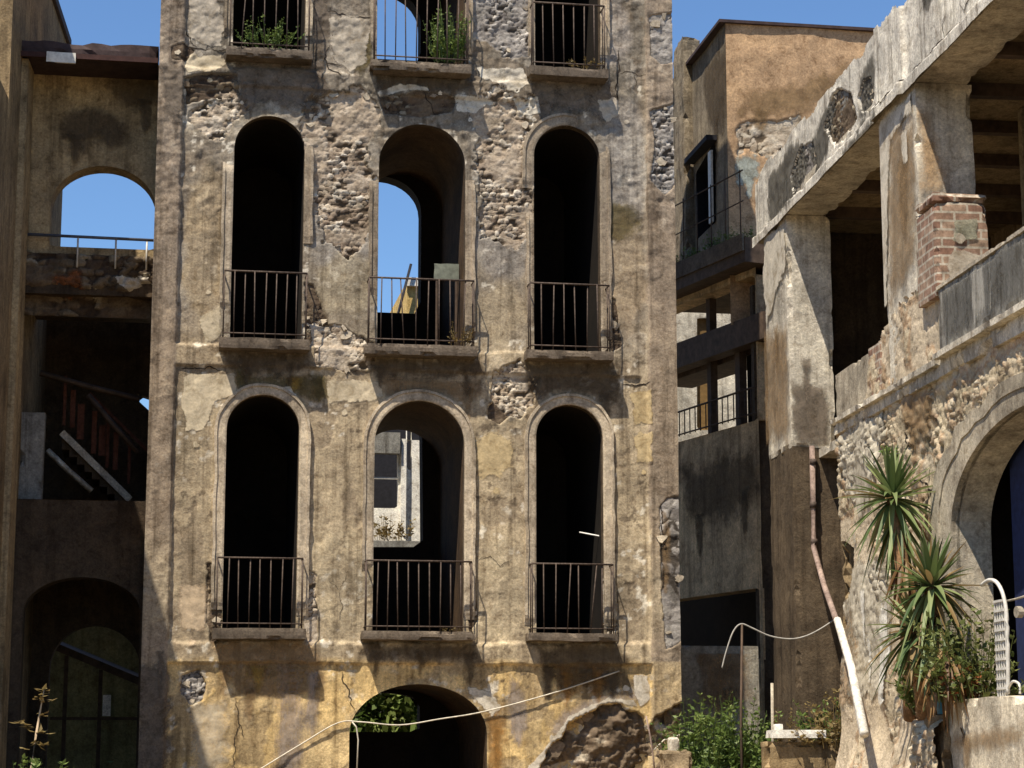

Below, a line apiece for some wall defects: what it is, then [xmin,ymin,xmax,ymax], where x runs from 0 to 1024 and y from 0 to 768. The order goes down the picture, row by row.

water stain [62,109,124,160]
spalling [171,0,249,142]
spalling [300,0,541,260]
spalling [650,104,677,194]
spalling [831,89,873,143]
spalling [304,283,383,415]
spalling [476,360,534,493]
water stain [682,455,760,556]
spalling [656,496,684,649]
peeling [180,670,225,768]
crack [233,700,244,768]
spalling [528,675,681,768]